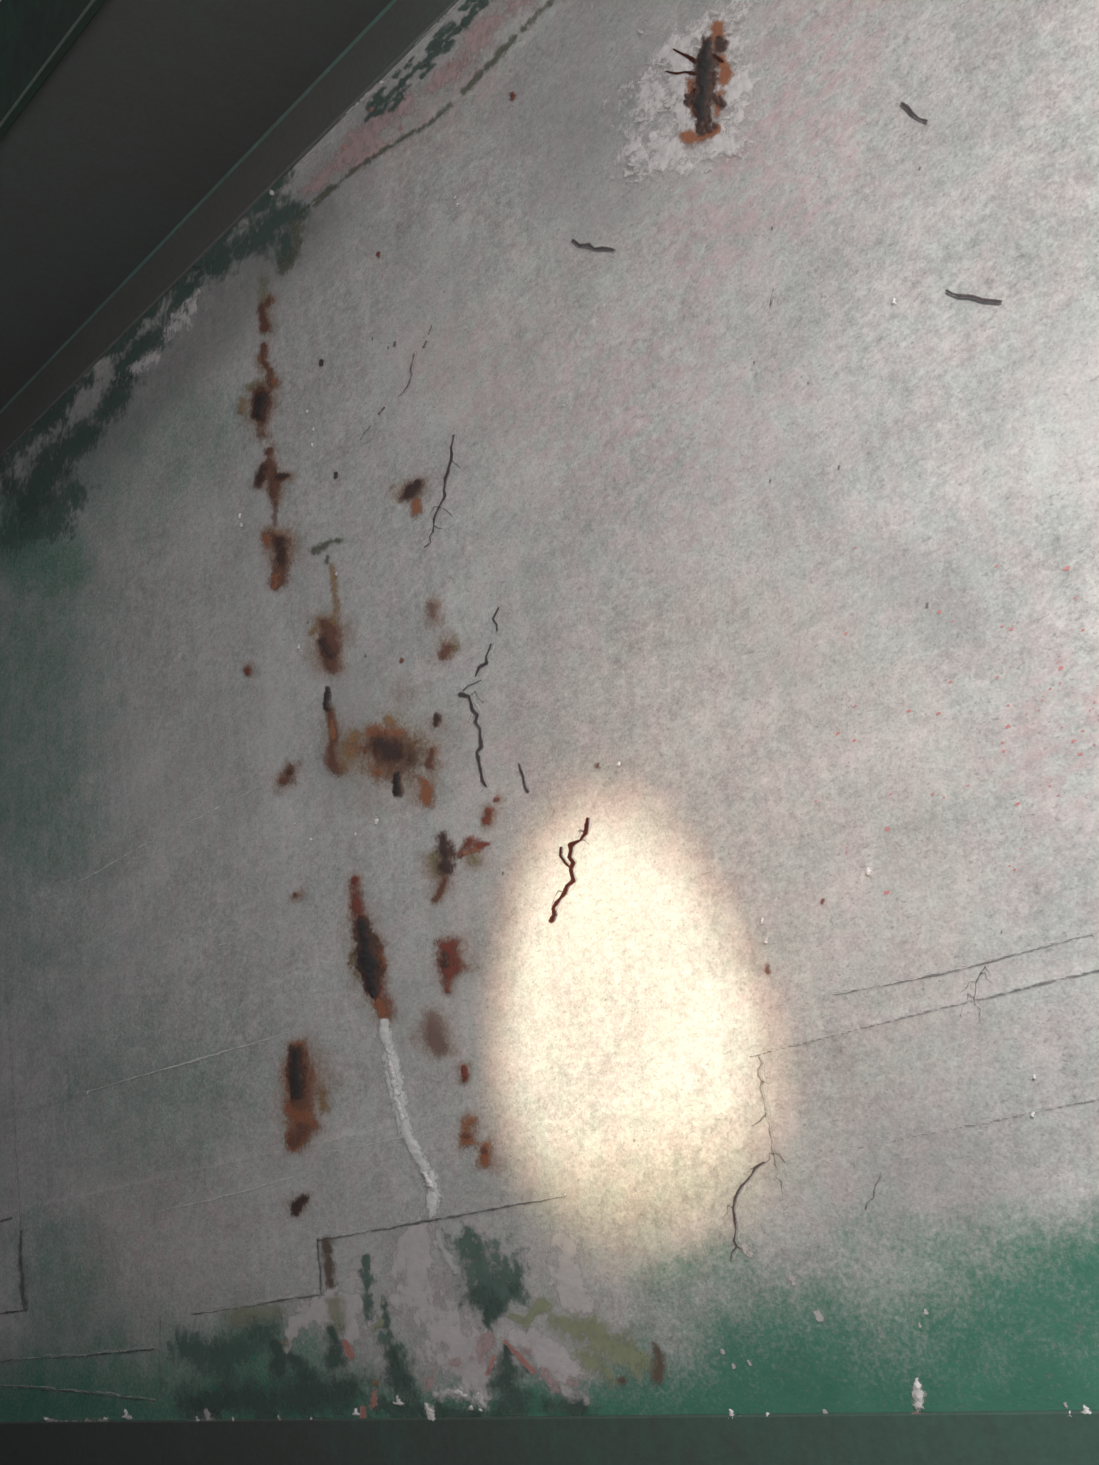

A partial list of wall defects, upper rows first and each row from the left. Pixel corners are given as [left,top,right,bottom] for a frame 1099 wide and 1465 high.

corrosion [239,278,294,590]
crack [424,434,460,548]
corrosion [309,565,441,807]
crack [458,607,499,787]
corrosion [348,875,393,1020]
corrosion [428,797,499,902]
crack [549,817,589,923]
efflorescence [379,1018,459,1274]
crack [724,1057,785,1262]
peeling [278,1282,373,1362]
peeling [352,1380,404,1418]
peeling [382,1216,597,1421]